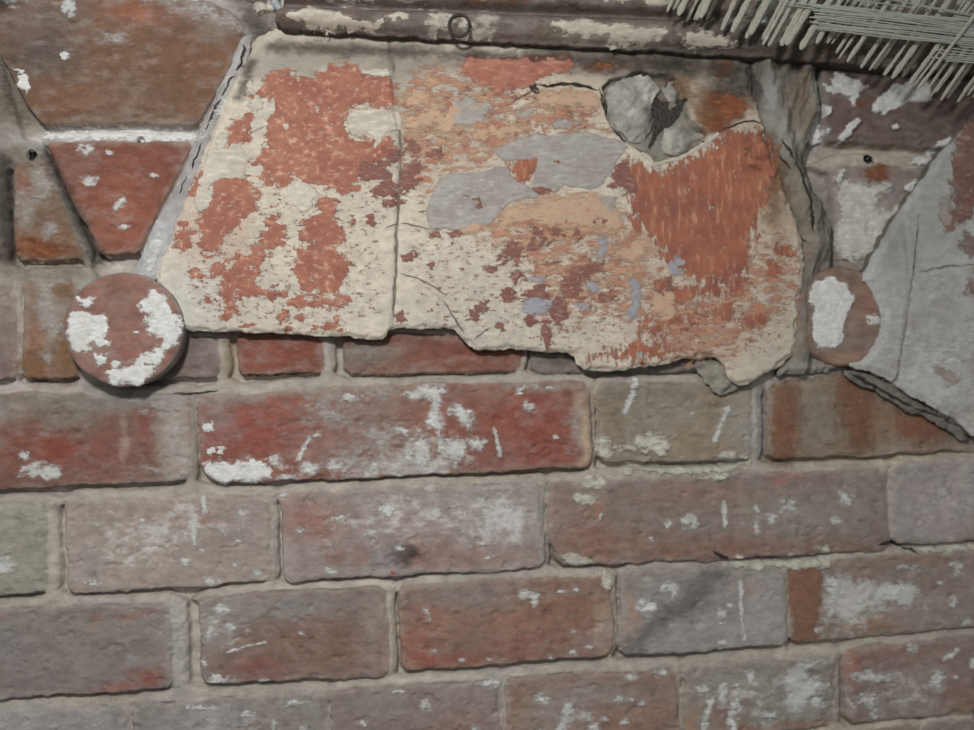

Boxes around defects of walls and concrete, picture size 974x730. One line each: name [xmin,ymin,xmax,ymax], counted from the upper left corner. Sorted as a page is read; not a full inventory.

crack [505,82,761,162]
crack [386,130,492,339]
peeling [171,0,813,370]
crack [779,139,815,243]
peeling [938,121,974,258]
crack [849,214,974,425]
damp [203,432,387,486]
damp [320,387,386,427]
damp [366,382,502,471]
damp [516,383,555,412]
peeling [932,366,961,388]